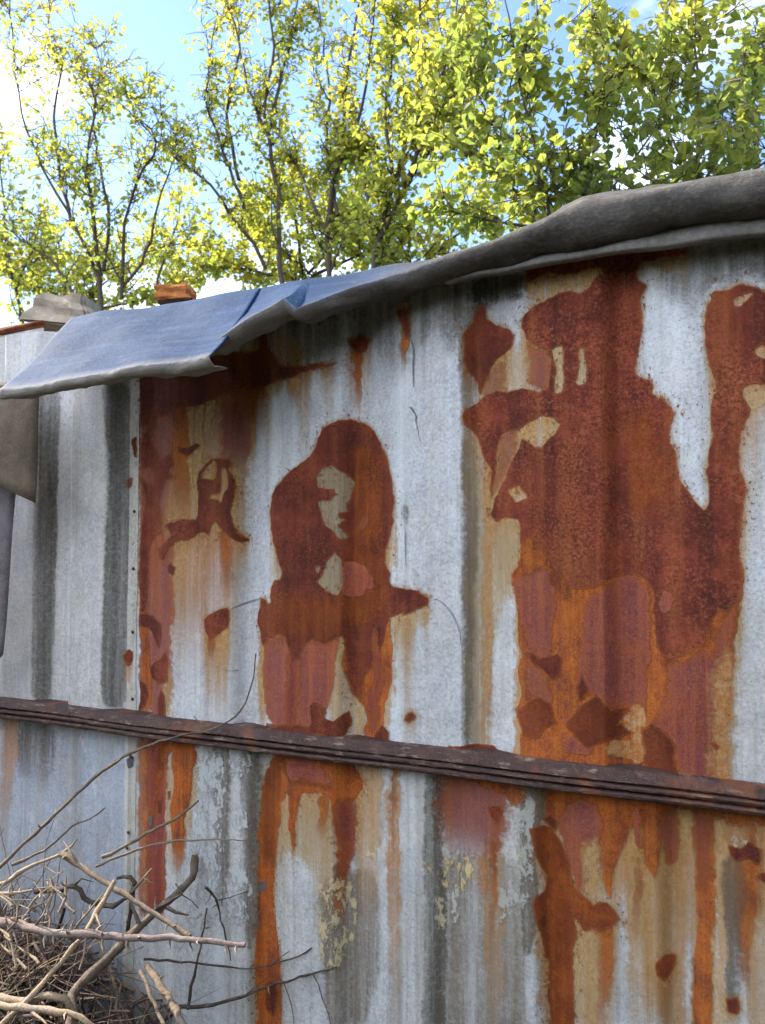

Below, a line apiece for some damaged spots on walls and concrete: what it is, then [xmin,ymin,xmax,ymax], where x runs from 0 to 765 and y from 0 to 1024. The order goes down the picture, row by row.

corrosion [397,301,410,356]
leakage [35,392,59,699]
leakage [101,387,130,706]
corrosion [123,331,438,740]
corrosion [451,245,765,779]
corrosion [127,736,197,916]
corrosion [243,755,401,1024]
peeling [313,871,378,1024]
corrosion [432,775,765,1024]